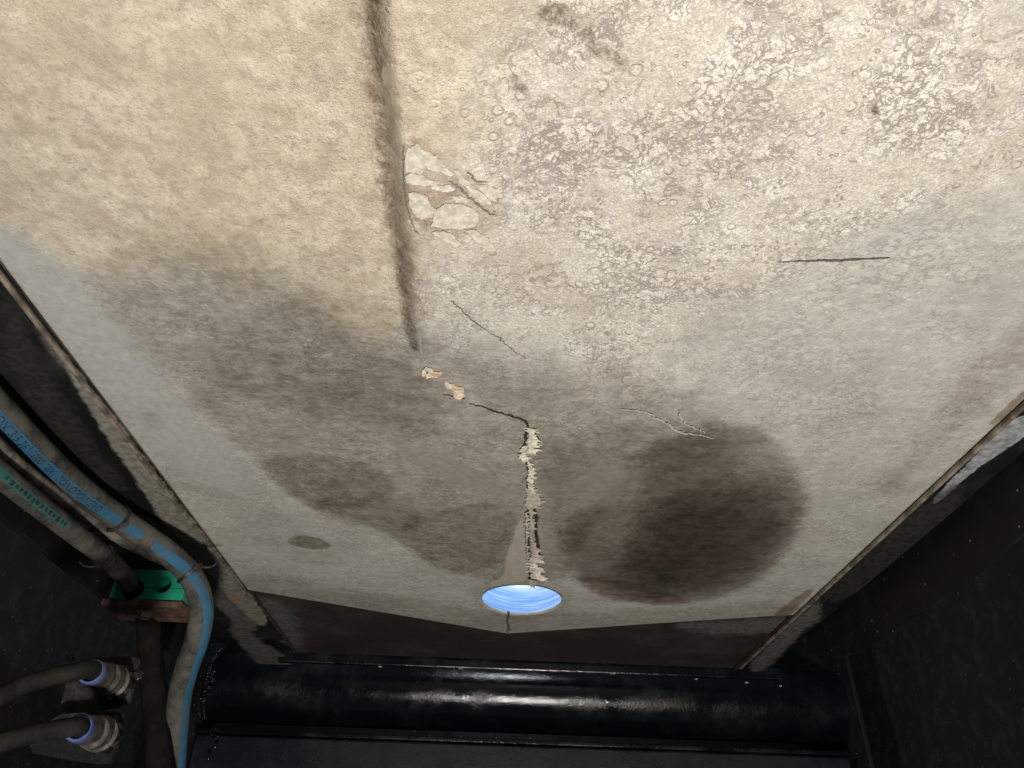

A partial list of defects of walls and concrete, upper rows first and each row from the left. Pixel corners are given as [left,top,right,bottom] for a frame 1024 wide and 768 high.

peeling [402,144,501,251]
crack [451,301,524,357]
peeling [421,367,465,400]
crack [622,409,714,439]
leakage [2,305,302,665]
crack [449,395,549,588]
leakage [680,416,1024,672]